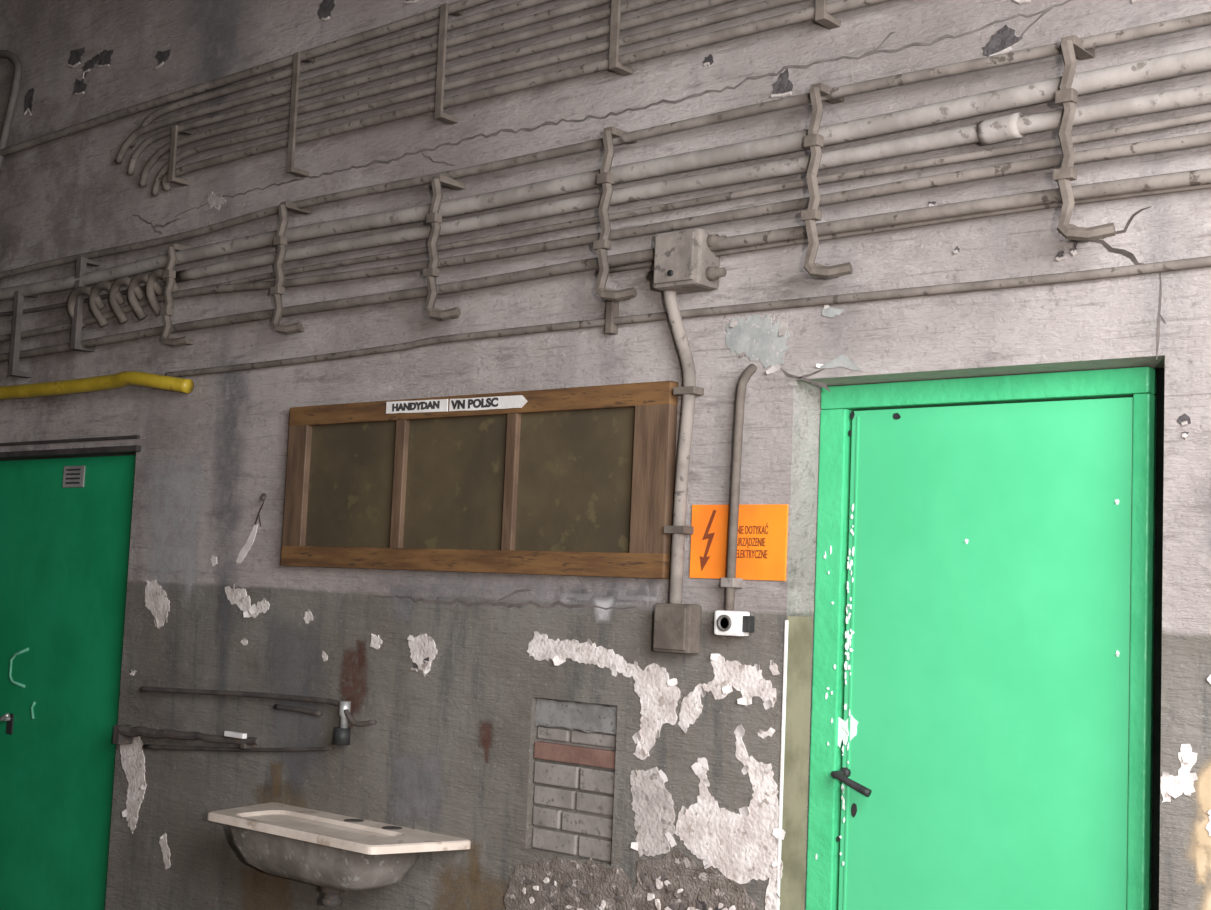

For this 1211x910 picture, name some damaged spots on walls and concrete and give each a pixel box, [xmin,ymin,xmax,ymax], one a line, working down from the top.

spalling [318,0,335,21]
spalling [67,47,114,95]
spalling [155,49,171,69]
spalling [771,69,793,98]
crack [133,0,1072,235]
crack [1091,206,1166,360]
peeling [224,584,270,618]
peeling [407,634,437,676]
corrosion [342,642,365,726]
peeling [504,631,786,910]
peeling [1160,744,1198,803]